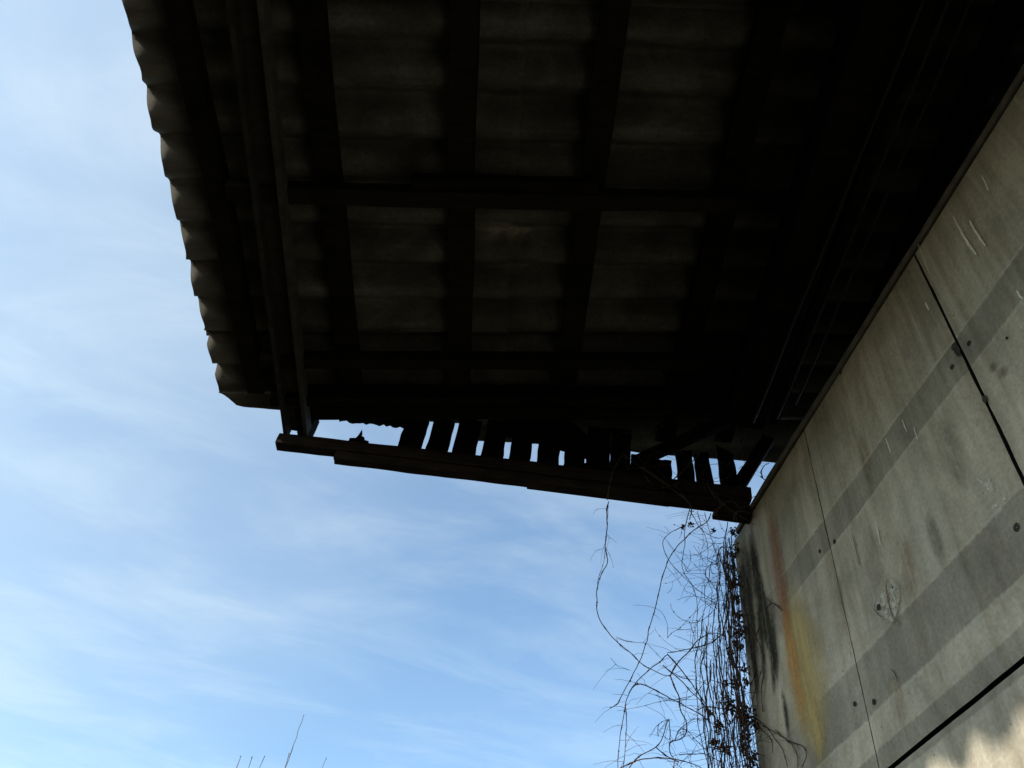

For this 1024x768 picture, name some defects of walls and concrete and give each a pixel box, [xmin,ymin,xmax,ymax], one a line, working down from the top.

damp [741,540,788,733]